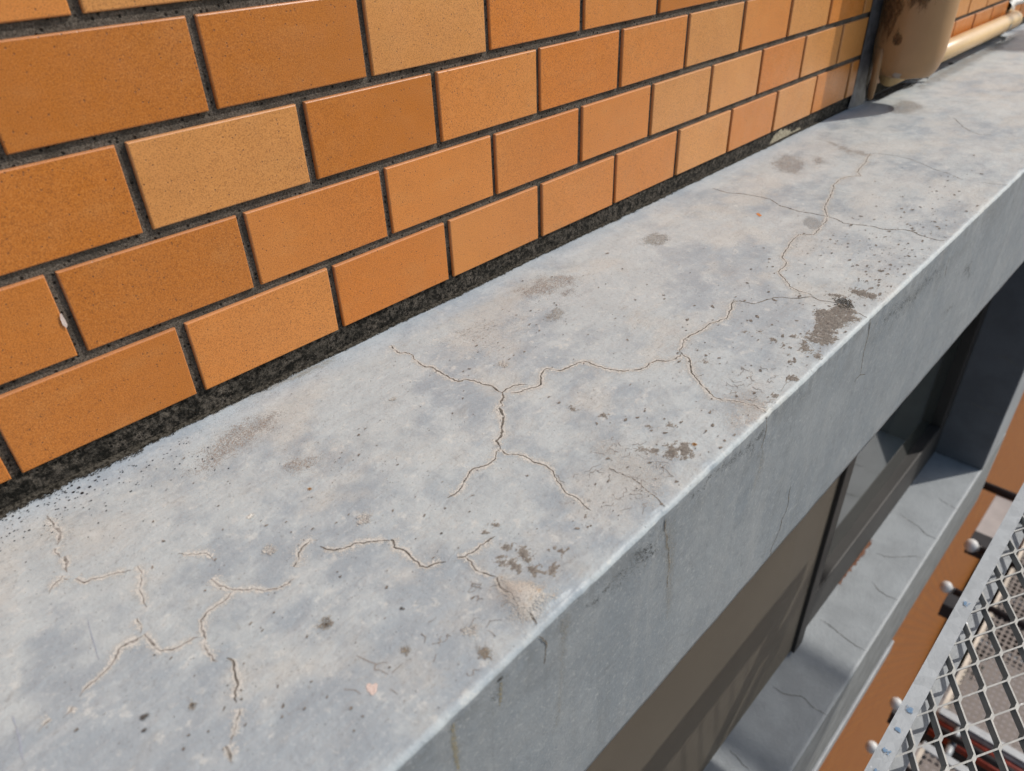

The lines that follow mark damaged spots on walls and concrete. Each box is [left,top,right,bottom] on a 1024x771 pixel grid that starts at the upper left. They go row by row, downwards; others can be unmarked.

crack [388,153,1000,587]
peeling [733,181,947,383]
crack [12,515,548,763]